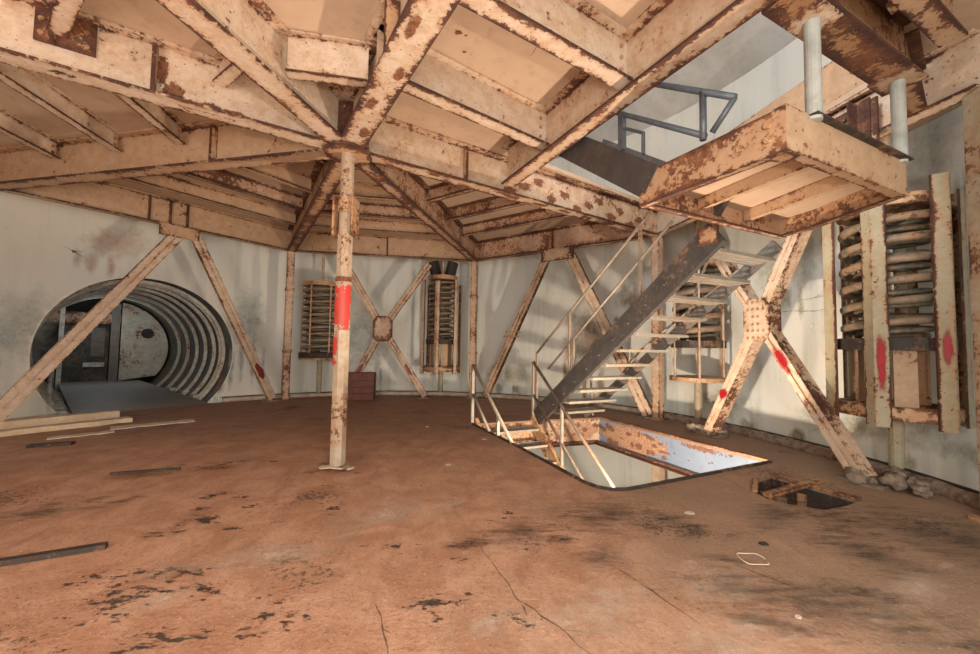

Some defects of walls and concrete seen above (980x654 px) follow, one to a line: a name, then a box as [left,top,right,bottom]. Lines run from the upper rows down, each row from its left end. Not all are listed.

corrosion [404,12,423,39]
corrosion [393,67,407,83]
peeling [546,421,733,464]
crack [474,539,591,654]